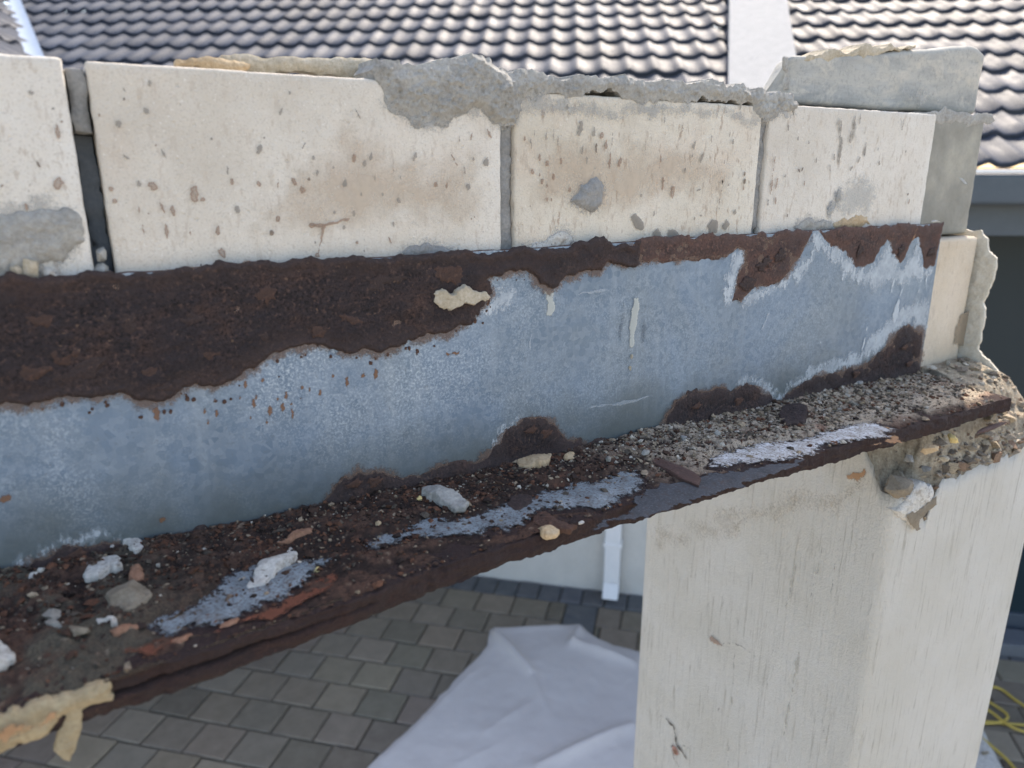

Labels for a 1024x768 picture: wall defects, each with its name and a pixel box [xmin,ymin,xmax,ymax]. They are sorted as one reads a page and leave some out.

corrosion [0,222,944,425]
corrosion [312,415,606,506]
peeling [363,422,895,549]
corrosion [847,469,866,481]
corrosion [507,494,577,535]
corrosion [13,540,123,568]
flaking render [83,538,143,584]
corrosion [128,564,144,582]
corrosion [277,528,313,545]
corrosion [215,574,336,633]
corrosion [109,623,138,637]
corrosion [125,633,193,655]